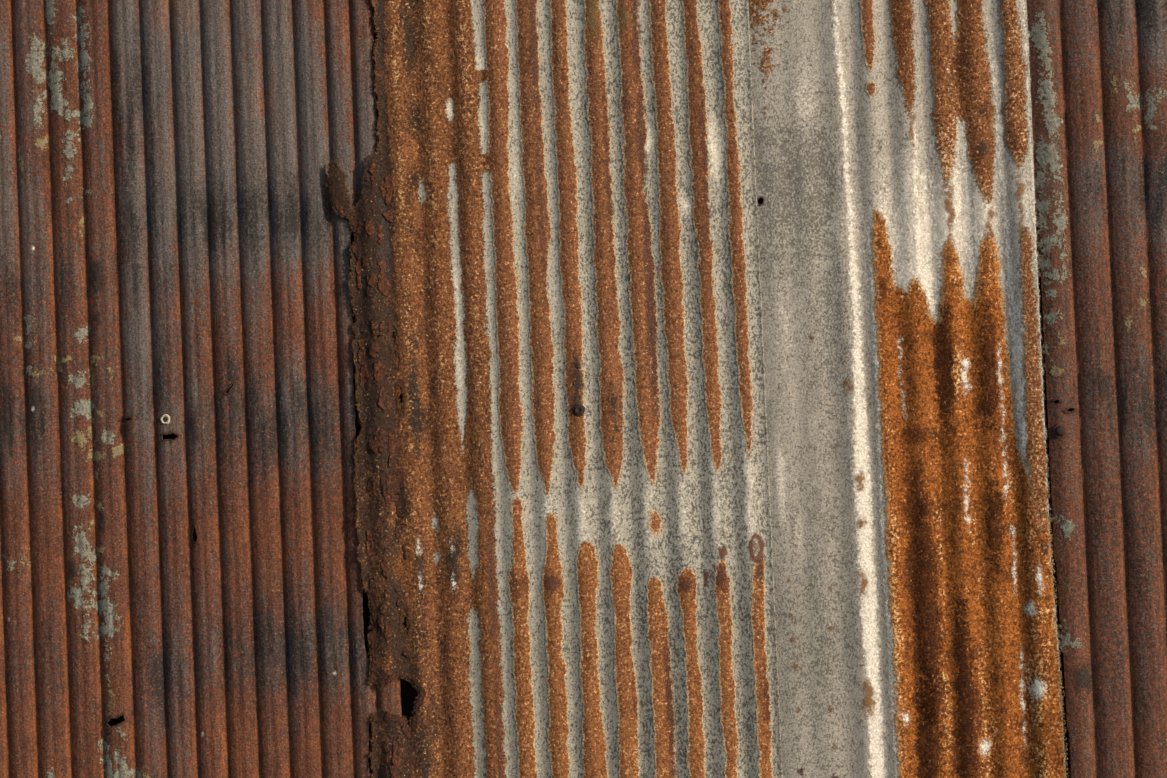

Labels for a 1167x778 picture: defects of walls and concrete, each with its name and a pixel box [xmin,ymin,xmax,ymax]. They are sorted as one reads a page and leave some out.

peeling [25,0,96,204]
corrosion [718,0,754,463]
corrosion [749,0,789,115]
peeling [1029,9,1070,376]
peeling [1092,113,1103,152]
peeling [1111,75,1167,139]
corrosion [325,0,740,778]
corrosion [859,0,1069,778]
peeling [12,312,125,712]
peeling [97,726,150,778]
corrosion [749,533,774,778]